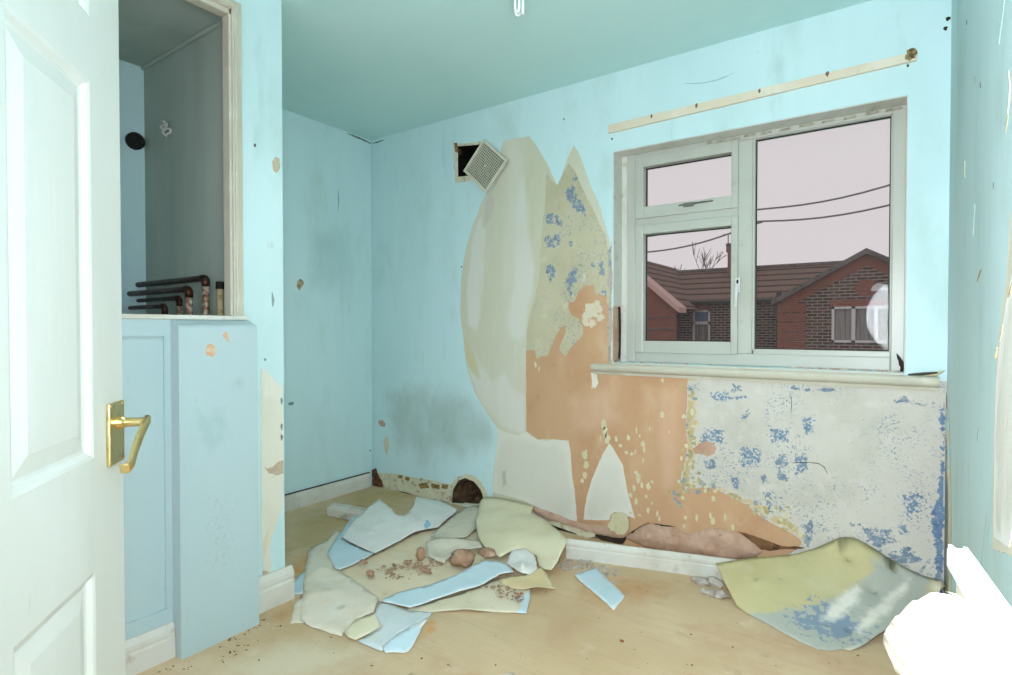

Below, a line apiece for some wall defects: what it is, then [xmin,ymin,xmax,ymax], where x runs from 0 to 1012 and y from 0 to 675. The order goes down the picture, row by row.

spalling [453,141,482,183]
peeling [205,344,216,357]
flaking render [526,163,951,595]
peeling [261,358,294,575]
peeling [372,468,488,505]